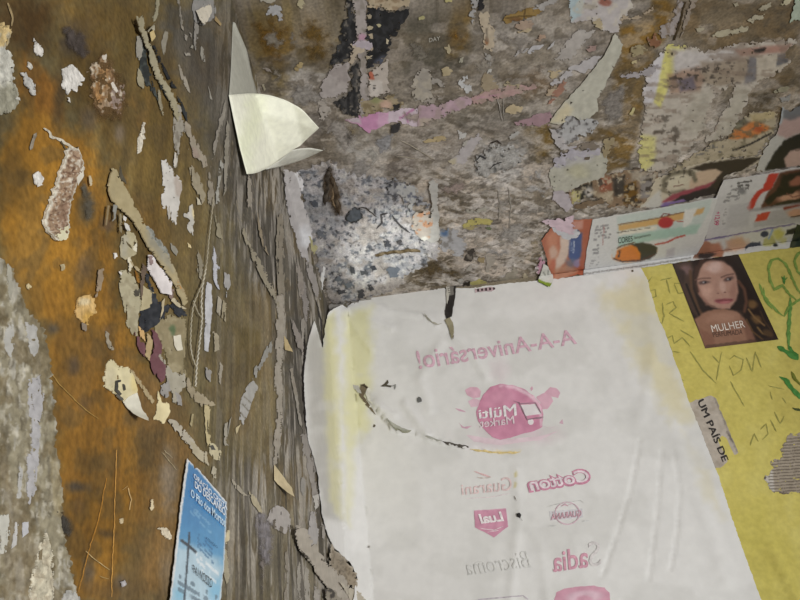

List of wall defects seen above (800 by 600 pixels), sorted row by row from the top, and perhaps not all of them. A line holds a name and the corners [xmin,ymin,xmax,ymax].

peeling [0,22,43,115]
rust [91,58,125,120]
flaking render [33,147,93,241]
spalling [0,258,80,600]